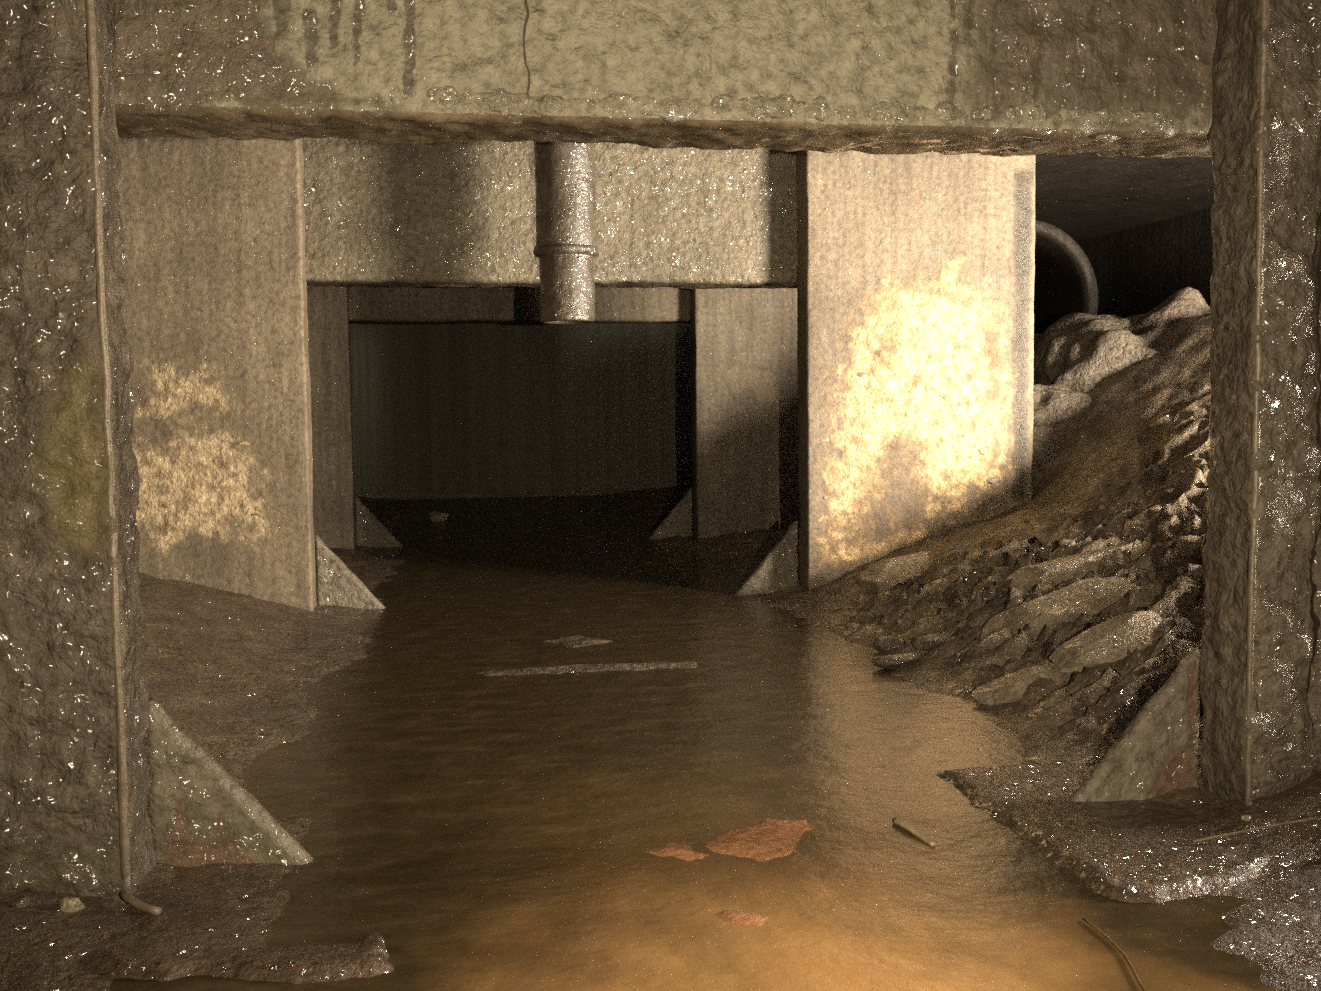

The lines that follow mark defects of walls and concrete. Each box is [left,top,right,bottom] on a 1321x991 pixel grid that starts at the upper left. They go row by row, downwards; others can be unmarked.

damp [114,0,365,113]
damp [388,0,416,94]
damp [1015,174,1030,497]
damp [862,439,925,529]
crack [1306,213,1321,738]